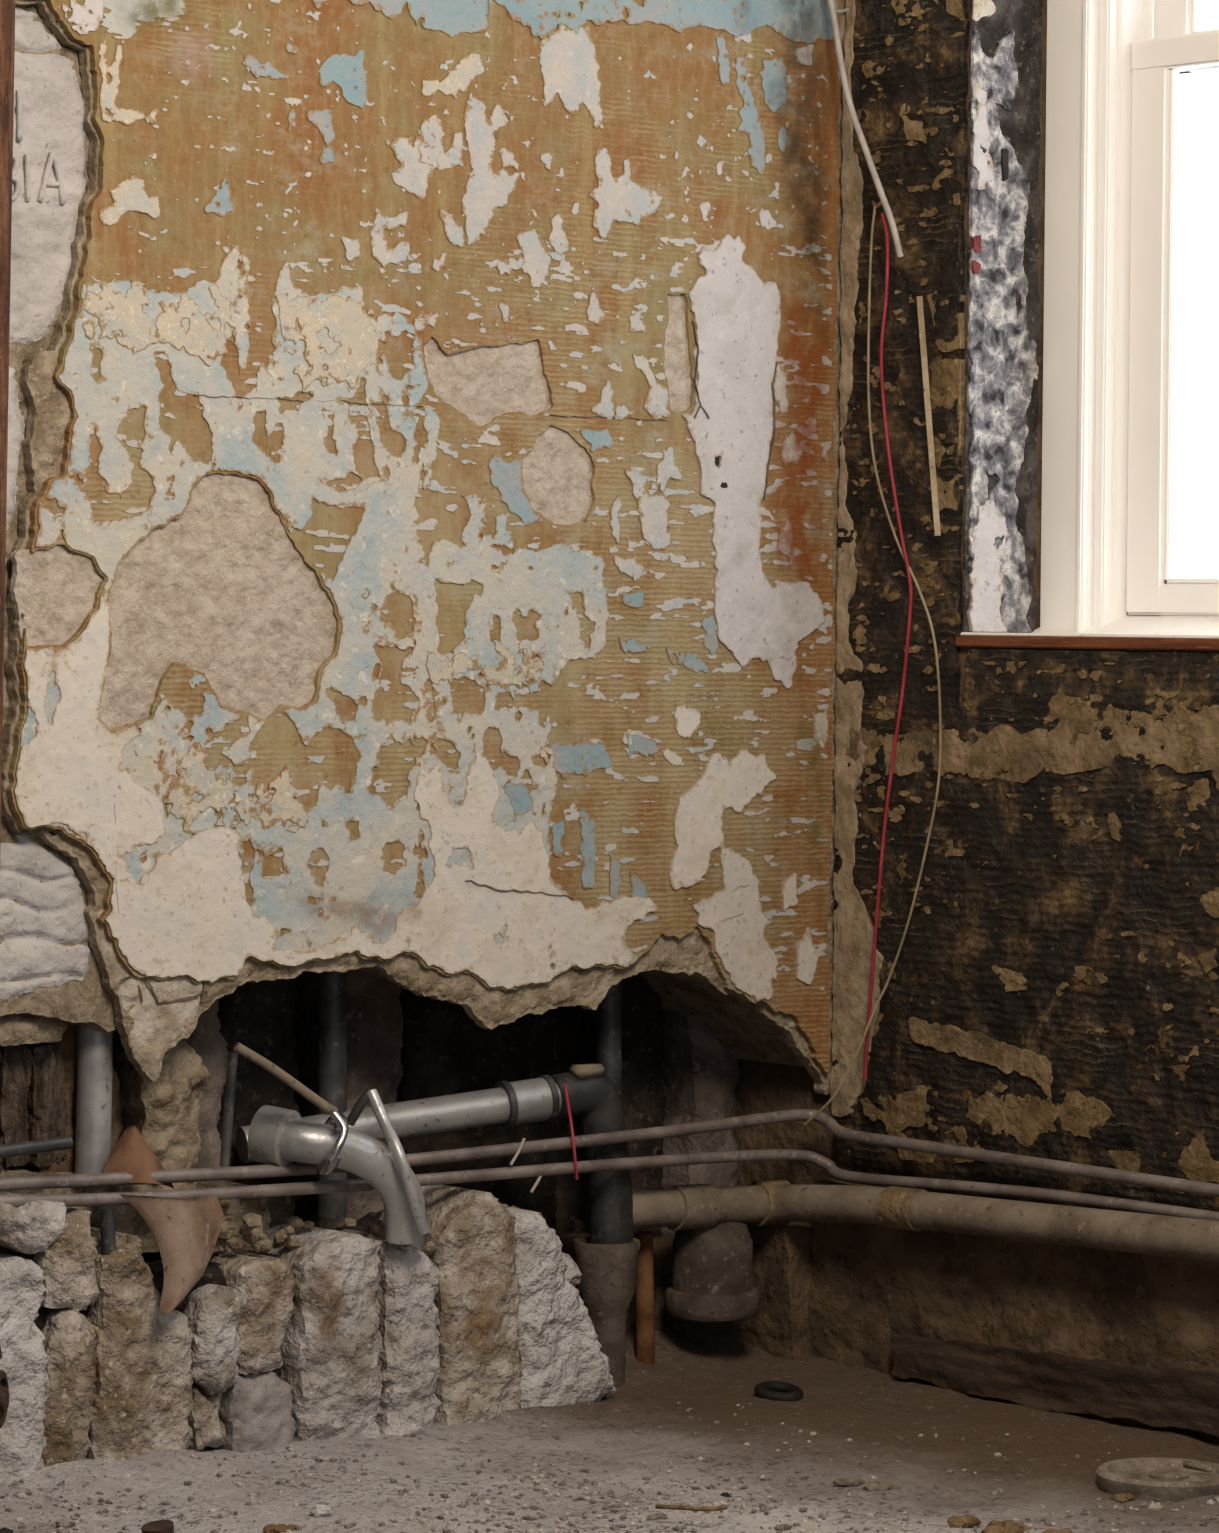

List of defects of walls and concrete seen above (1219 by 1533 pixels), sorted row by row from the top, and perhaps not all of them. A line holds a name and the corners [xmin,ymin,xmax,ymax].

peeling [0,0,1219,1163]